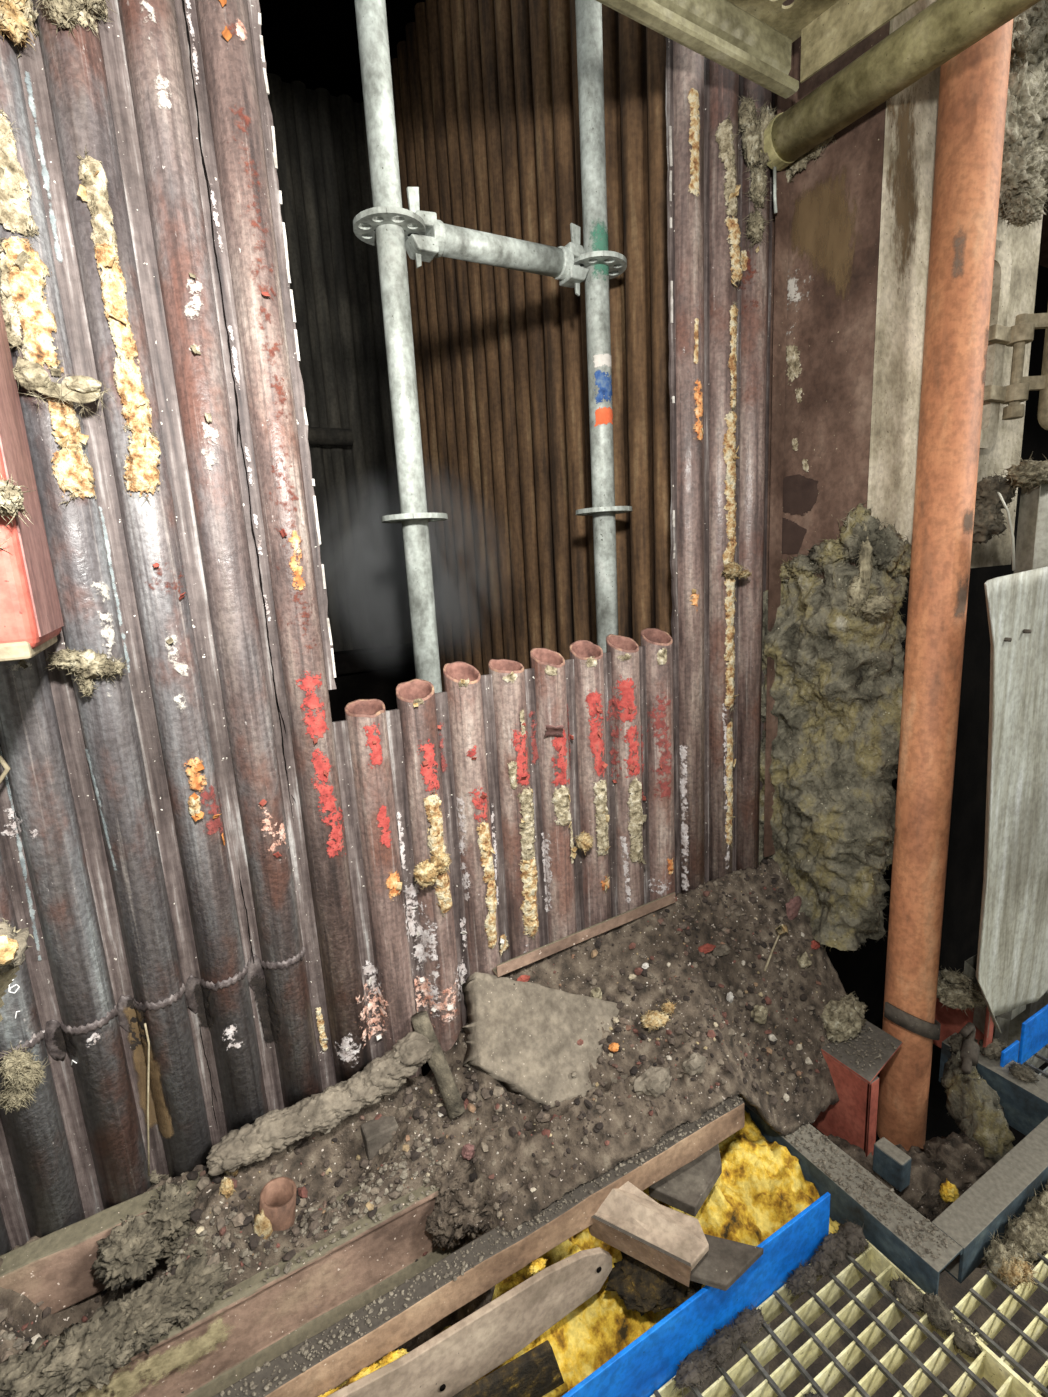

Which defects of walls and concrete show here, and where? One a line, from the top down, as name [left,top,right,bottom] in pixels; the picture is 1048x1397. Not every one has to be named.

corrosion [221,20,247,42]
corrosion [687,88,700,197]
corrosion [693,318,704,440]
corrosion [544,725,565,737]
corrosion [184,757,225,845]